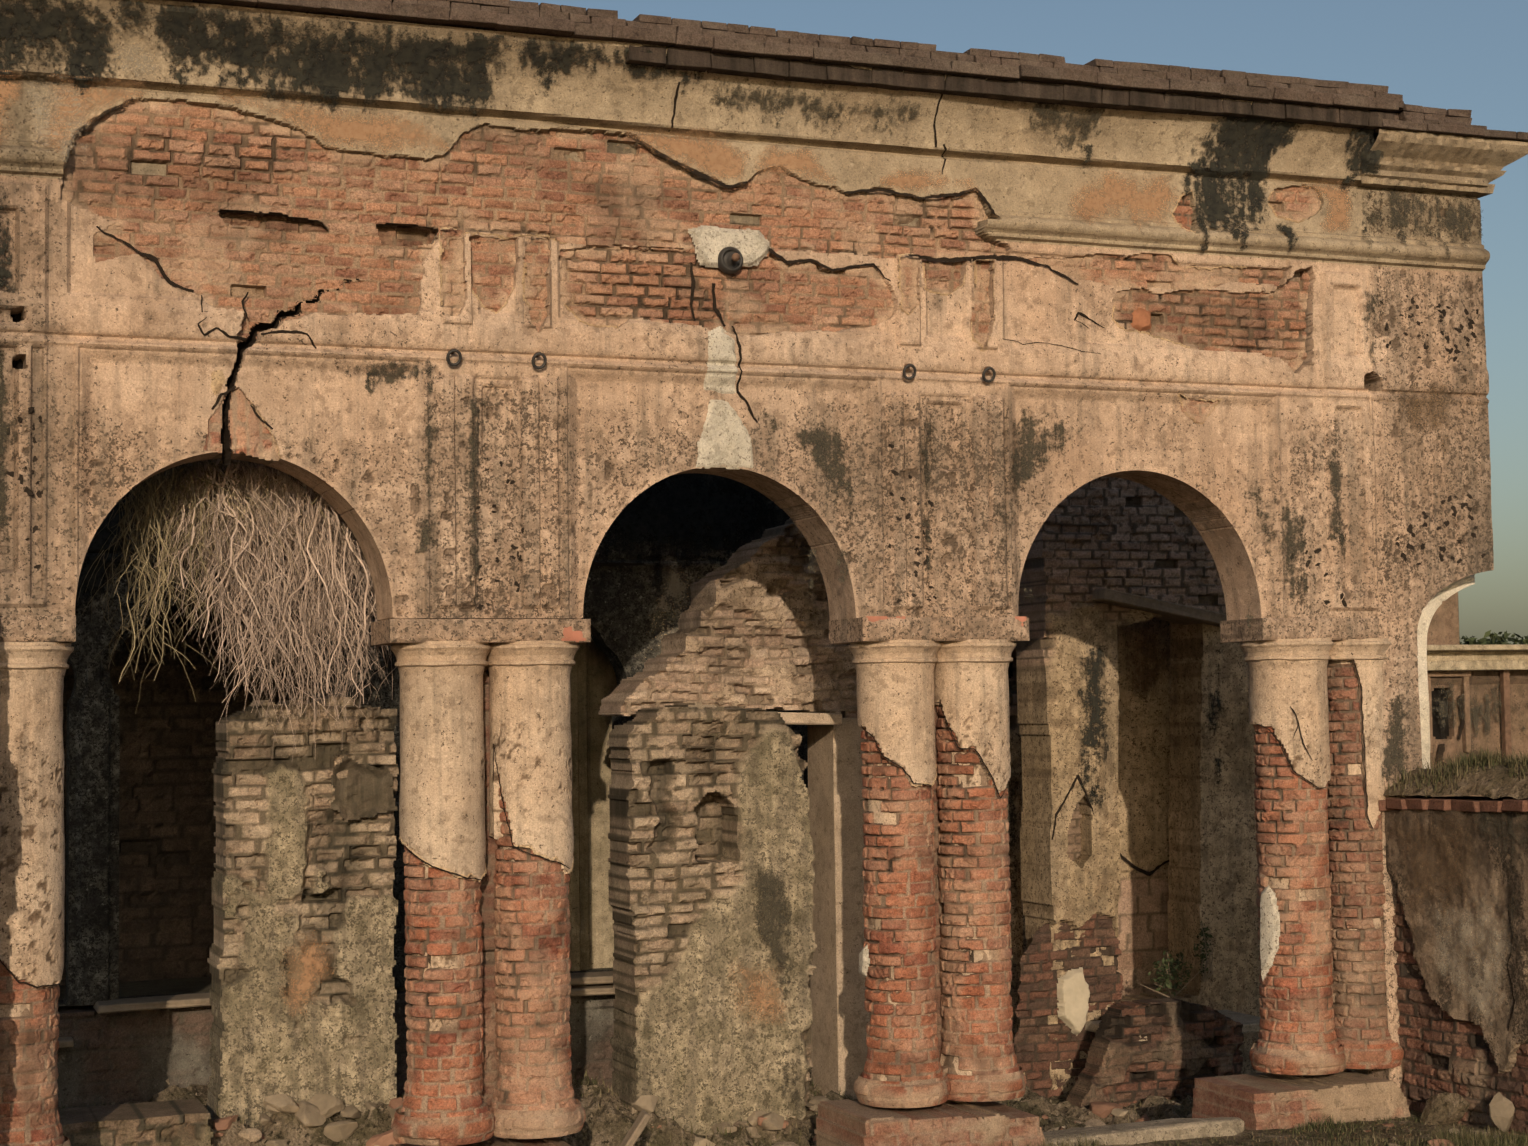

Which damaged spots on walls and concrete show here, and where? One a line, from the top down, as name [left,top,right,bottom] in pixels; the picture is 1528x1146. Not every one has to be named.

water stain [170,66,190,87]
crack [96,226,359,465]
flaking render [61,100,1007,352]
crack [690,262,758,422]
flaking render [1029,254,1310,371]
water stain [1197,218,1249,253]
water stain [1276,224,1298,251]
spalling [331,756,397,822]
flaking render [399,744,577,1118]
flaking render [861,702,1124,1098]
flaking render [1253,653,1528,1136]
flaking render [0,959,64,1146]